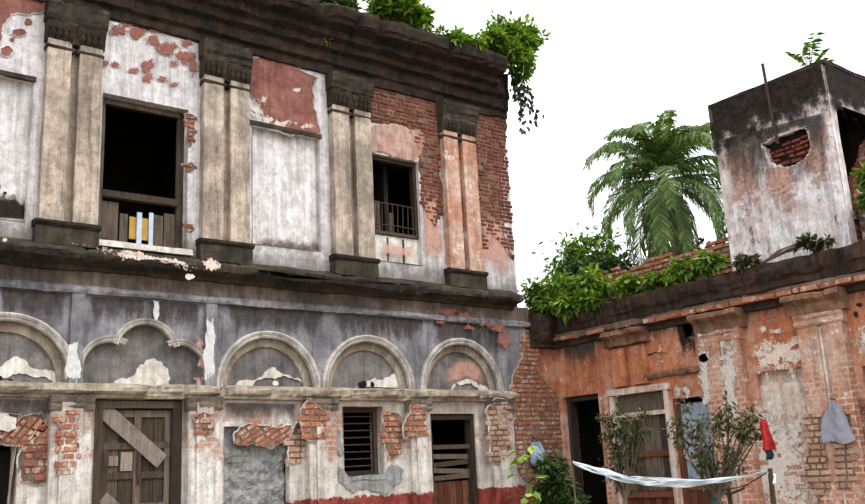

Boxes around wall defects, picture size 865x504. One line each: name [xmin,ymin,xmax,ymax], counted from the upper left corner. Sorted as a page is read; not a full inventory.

water stain [0,186,25,219]
peeling [0,0,45,58]
peeling [103,22,200,86]
peeling [250,57,321,137]
flaking render [371,88,444,226]
flaking render [475,114,515,260]
water stain [708,64,865,176]
peeling [0,356,56,382]
flaking render [0,409,81,486]
flaking render [233,398,428,494]
flaking render [436,306,565,487]
flaking render [669,320,865,504]